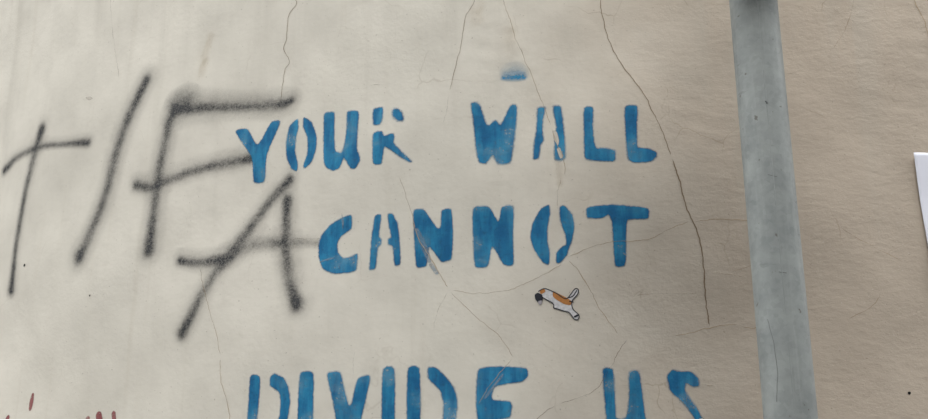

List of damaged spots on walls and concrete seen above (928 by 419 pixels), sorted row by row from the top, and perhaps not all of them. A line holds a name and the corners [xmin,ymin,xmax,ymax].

crack [400,0,754,419]